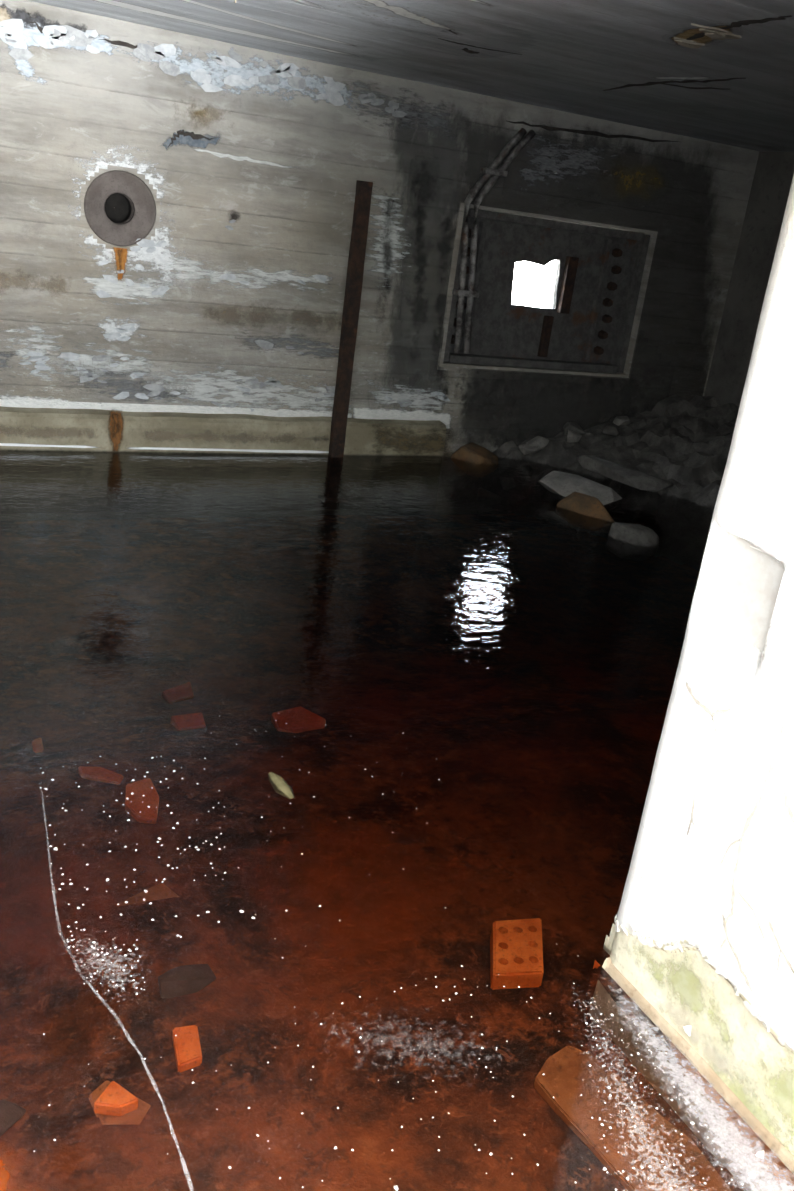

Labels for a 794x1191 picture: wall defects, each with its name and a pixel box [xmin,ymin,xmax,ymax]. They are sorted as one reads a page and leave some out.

peeling [0,7,455,139]
corrosion [113,247,128,280]
corrosion [109,411,124,452]
peeling [603,913,794,1156]